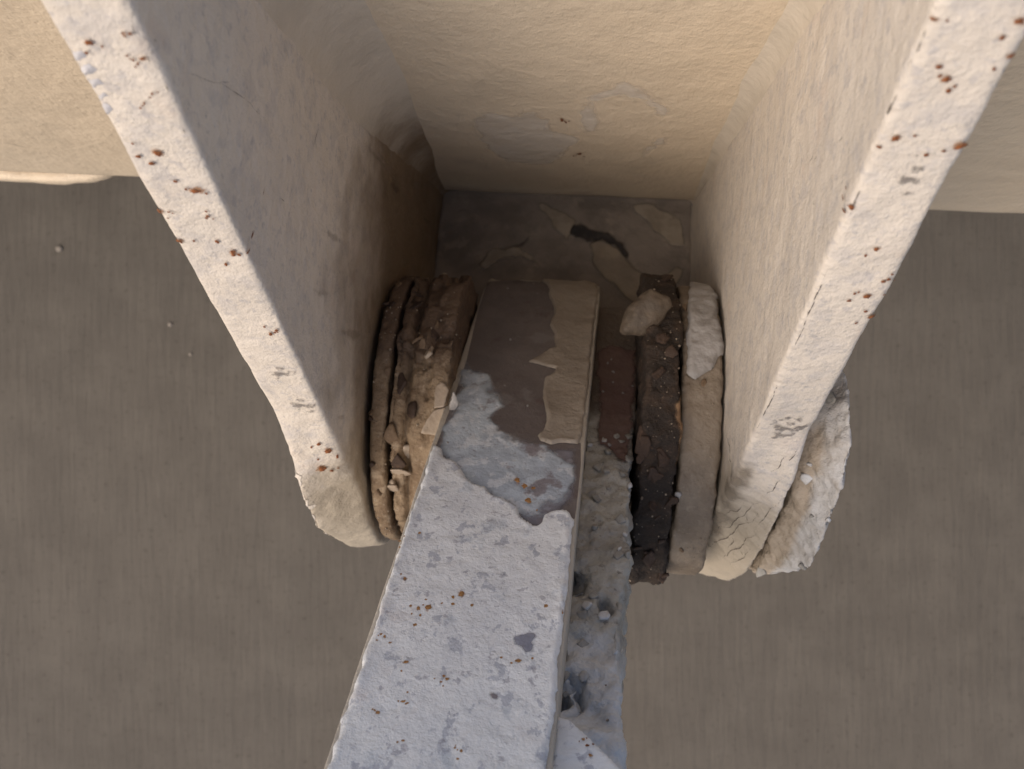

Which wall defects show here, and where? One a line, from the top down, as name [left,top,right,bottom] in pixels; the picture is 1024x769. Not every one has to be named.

corrosion [935,65,957,94]
peeling [421,280,581,526]
crack [717,455,795,565]
corrosion [409,591,474,626]